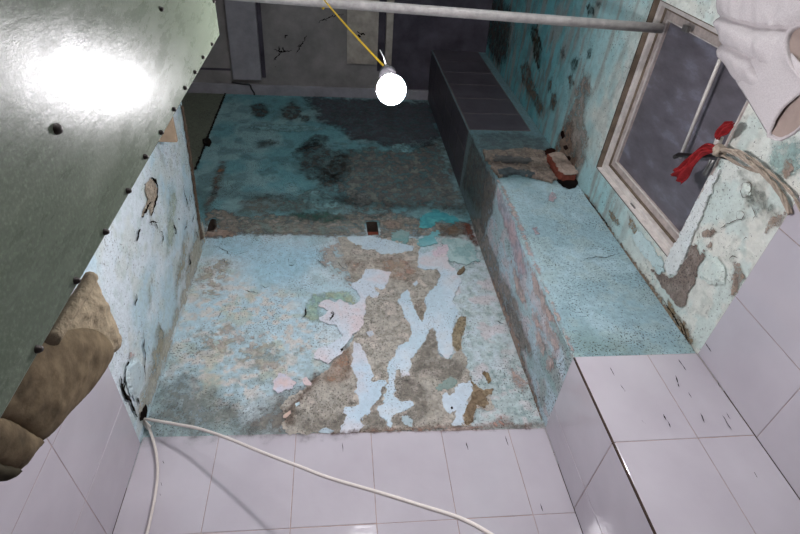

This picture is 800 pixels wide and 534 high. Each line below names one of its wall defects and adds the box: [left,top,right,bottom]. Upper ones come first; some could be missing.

leakage [491,0,511,12]
crack [274,35,307,67]
leakage [487,21,511,65]
leakage [521,24,557,115]
flaking render [142,177,158,218]
peeling [181,105,494,435]
leakage [240,96,545,423]
peeling [585,169,721,344]
peeling [730,263,745,296]